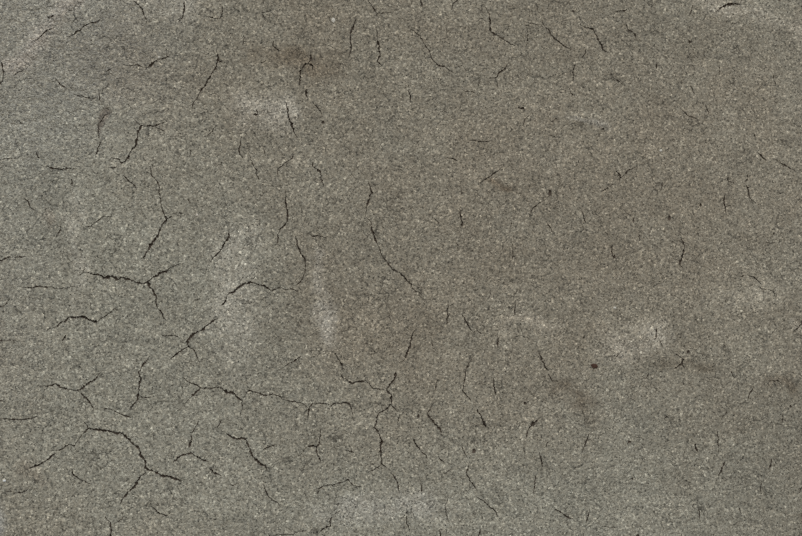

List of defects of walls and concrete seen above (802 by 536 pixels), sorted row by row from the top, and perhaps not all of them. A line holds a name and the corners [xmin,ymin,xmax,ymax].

crack [33,14,100,41]
crack [349,0,391,66]
crack [192,50,222,107]
crack [299,52,323,117]
crack [0,78,326,363]
crack [365,182,422,295]
crack [29,356,237,536]
crack [217,420,280,505]
crack [183,377,354,463]
crack [277,332,433,494]
crack [413,439,497,515]
crack [462,357,486,427]